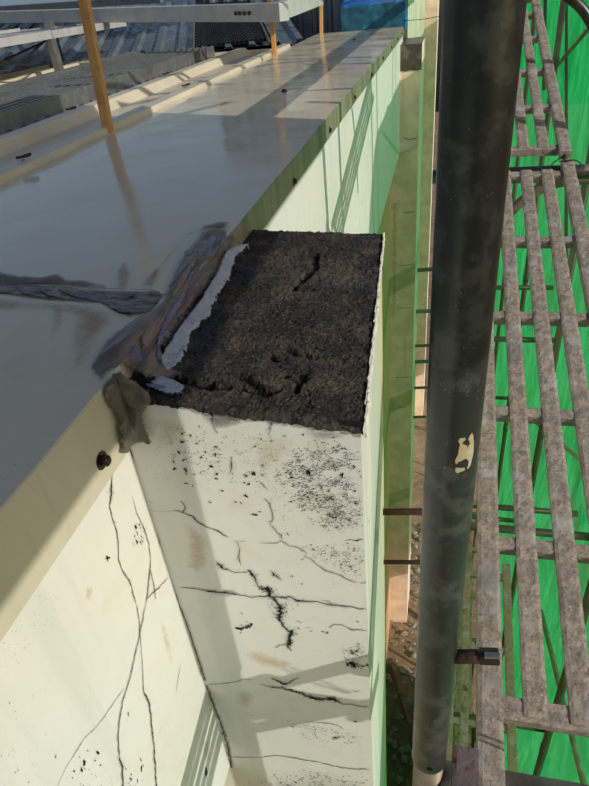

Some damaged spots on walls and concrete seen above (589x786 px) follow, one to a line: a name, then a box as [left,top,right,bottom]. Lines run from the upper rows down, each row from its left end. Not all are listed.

spalling [130,229,385,438]
leakage [159,426,363,532]
crack [58,478,369,786]